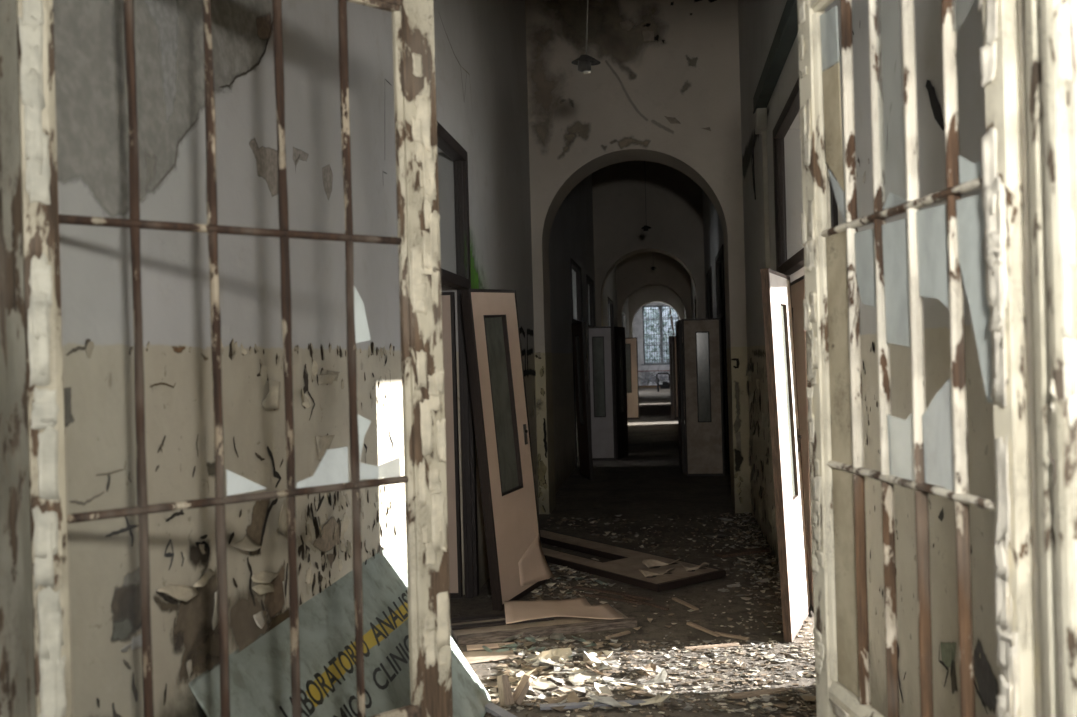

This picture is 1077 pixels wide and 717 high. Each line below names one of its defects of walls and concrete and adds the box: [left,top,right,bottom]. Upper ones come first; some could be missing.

peeling [18,0,273,216]
peeling [412,53,423,77]
peeling [411,95,440,315]
water stain [559,122,589,158]
water stain [530,0,664,146]
peeling [799,99,810,168]
peeling [925,80,945,131]
peeling [981,127,1008,408]
peeling [294,342,395,420]
peeling [803,291,818,444]
spalling [111,446,400,683]
peeling [973,435,1020,717]